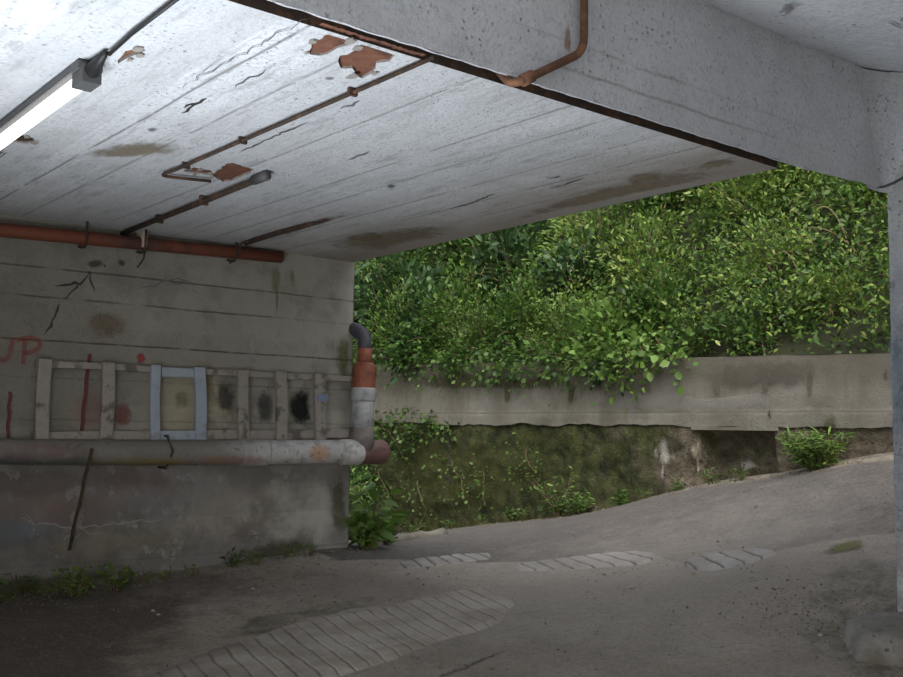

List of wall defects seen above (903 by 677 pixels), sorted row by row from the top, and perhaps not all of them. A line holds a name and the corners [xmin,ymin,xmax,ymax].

spalling [118,46,145,63]
crack [183,19,304,113]
spalling [305,23,426,79]
damp [98,144,166,157]
spalling [184,163,254,182]
damp [345,228,433,247]
crack [45,273,96,333]
damp [219,387,234,410]
damp [290,391,310,423]
crack [22,514,165,534]